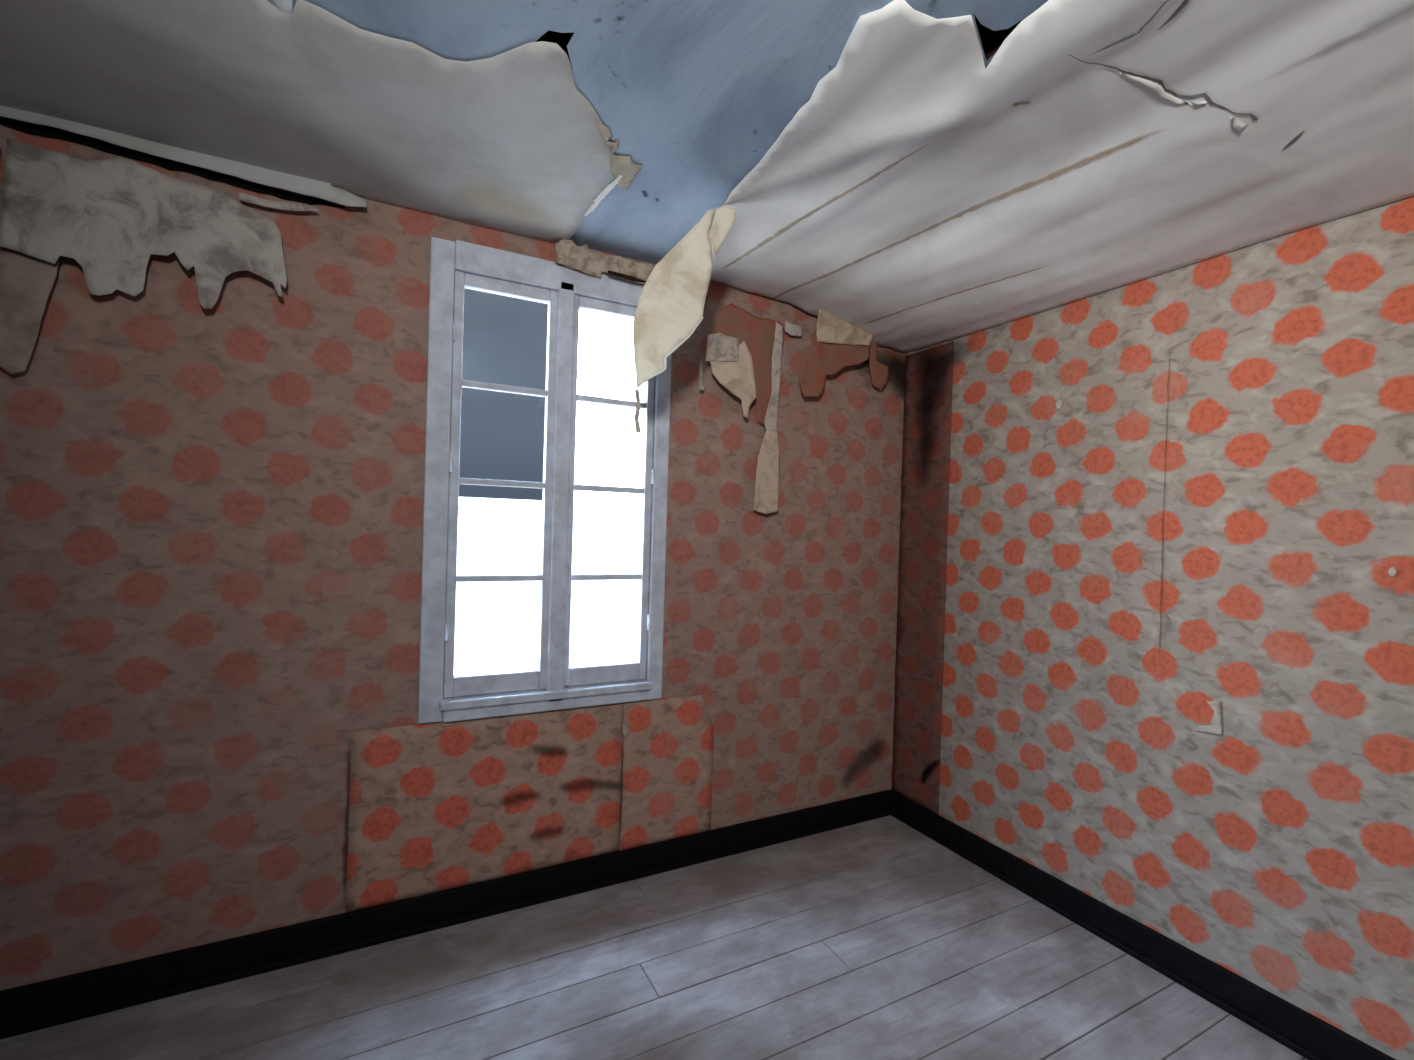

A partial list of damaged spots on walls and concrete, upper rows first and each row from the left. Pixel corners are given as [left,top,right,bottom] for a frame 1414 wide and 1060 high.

crack [1069,0,1258,130]
spalling [594,118,642,190]
crack [1282,130,1305,150]
peeling [554,206,737,433]